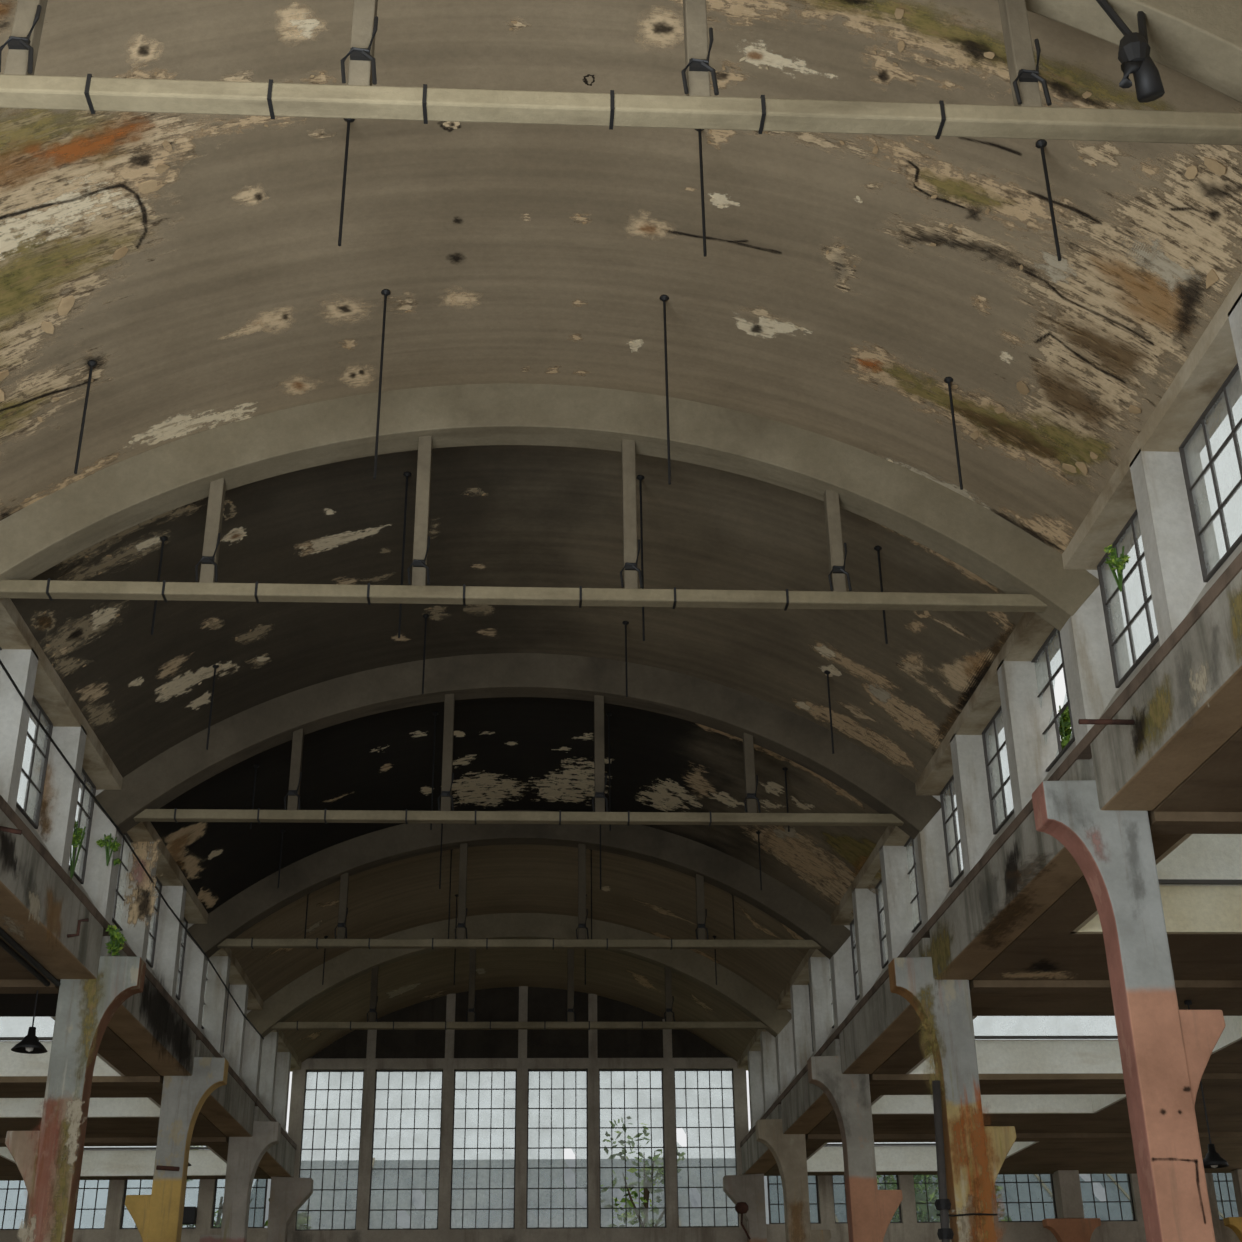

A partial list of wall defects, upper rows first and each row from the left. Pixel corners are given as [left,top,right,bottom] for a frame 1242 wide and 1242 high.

water stain [0,108,225,403]
water stain [843,134,1242,496]
peeling [0,344,113,462]
peeling [0,402,258,521]
peeling [221,500,247,543]
peeling [31,600,128,677]
peeling [128,652,272,710]
peeling [793,611,994,770]
peeling [452,731,612,807]
peeling [636,761,815,812]
water stain [140,979,192,1073]
rust [951,1110,1001,1242]